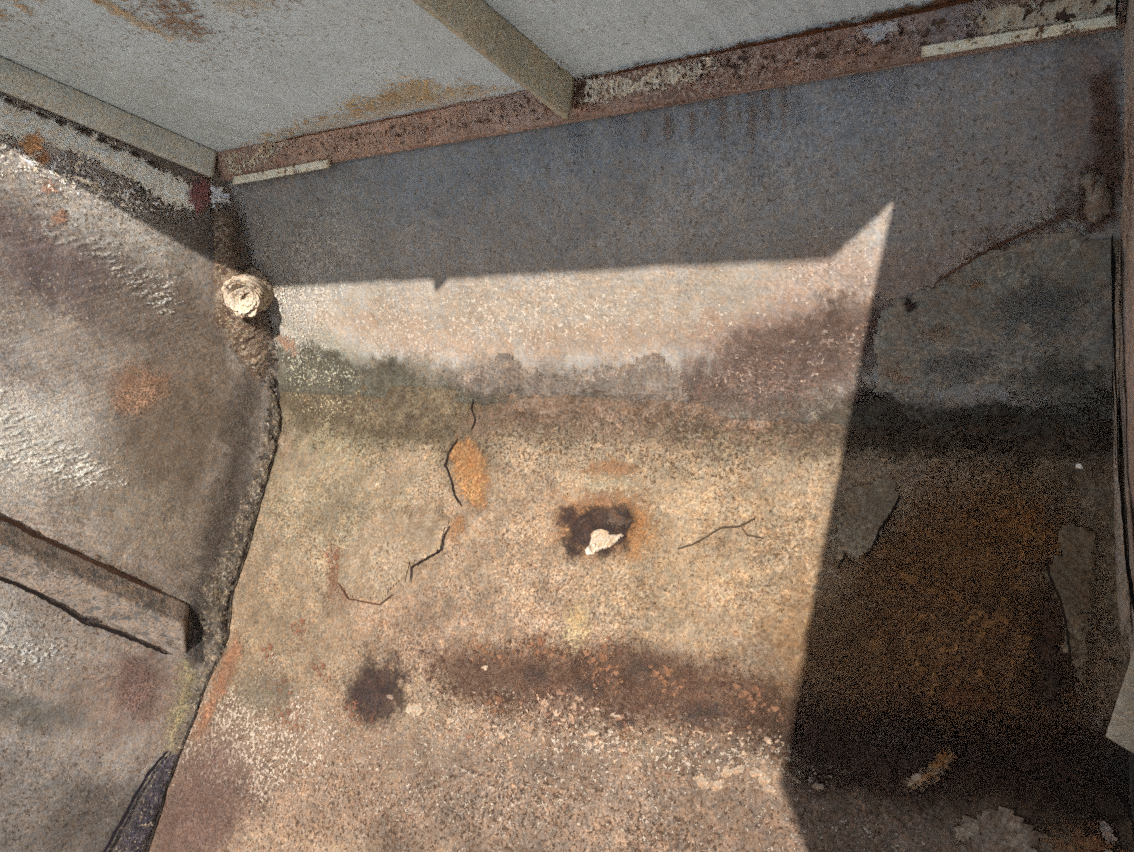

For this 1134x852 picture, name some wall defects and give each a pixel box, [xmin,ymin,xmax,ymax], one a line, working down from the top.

corrosion [554,0,972,110]
peeling [874,218,1119,415]
water stain [282,344,366,423]
crack [1111,235,1134,611]
corrosion [444,436,489,539]
corrosion [553,459,653,559]
peeling [824,475,902,567]
peeling [1043,523,1100,714]
water stain [344,657,425,727]
corrosion [417,490,1128,852]
water stain [908,752,952,786]
peeling [952,806,1050,852]